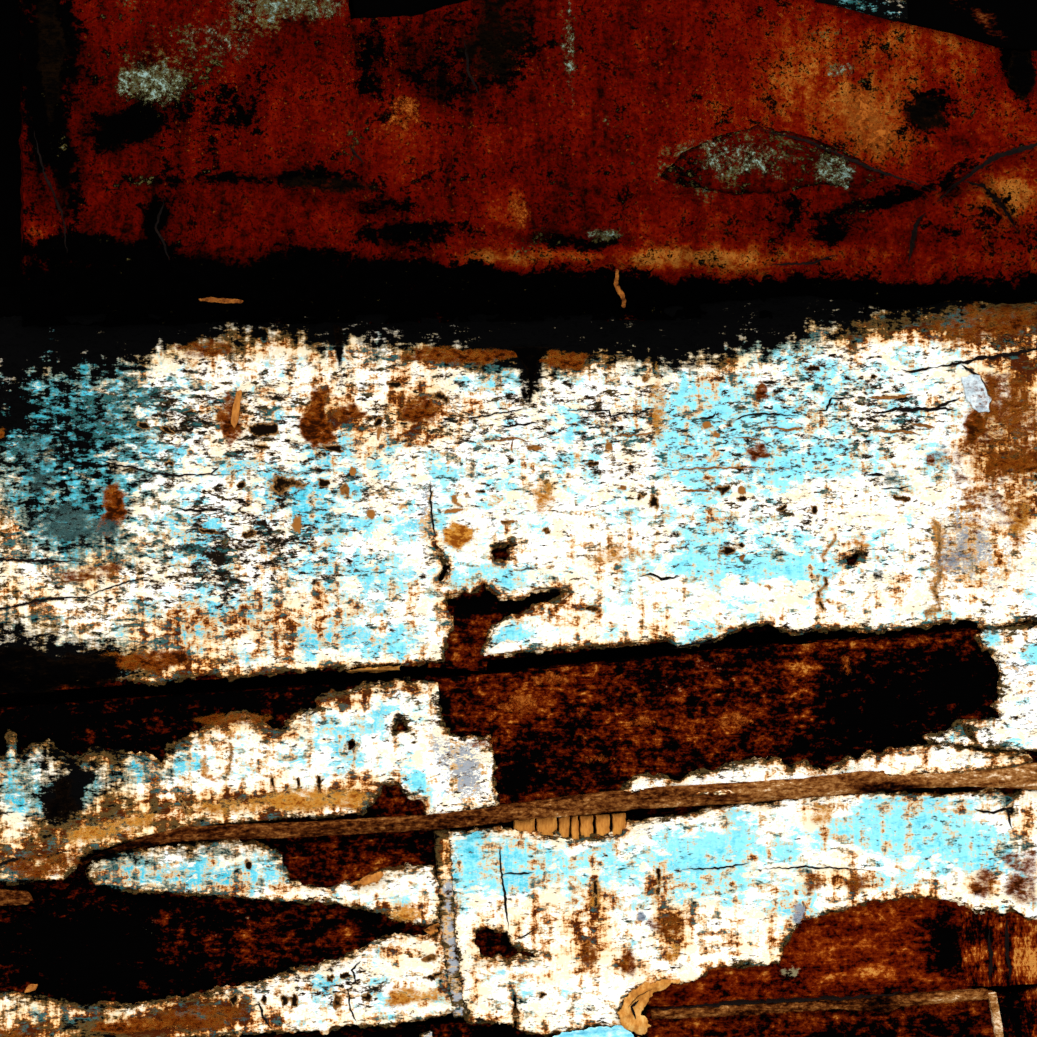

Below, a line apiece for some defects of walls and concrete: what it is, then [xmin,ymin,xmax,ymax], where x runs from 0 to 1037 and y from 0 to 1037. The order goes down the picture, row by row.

rust [17,0,1037,345]
rust [174,339,232,357]
rust [298,382,367,450]
crack [428,481,436,541]
crack [665,348,1037,492]
rust [926,370,1037,546]
peeling [0,665,401,762]
peeling [411,583,999,806]
peeling [262,829,438,888]
peeling [0,880,440,1010]
rust [620,950,636,976]
peeling [553,896,972,1037]